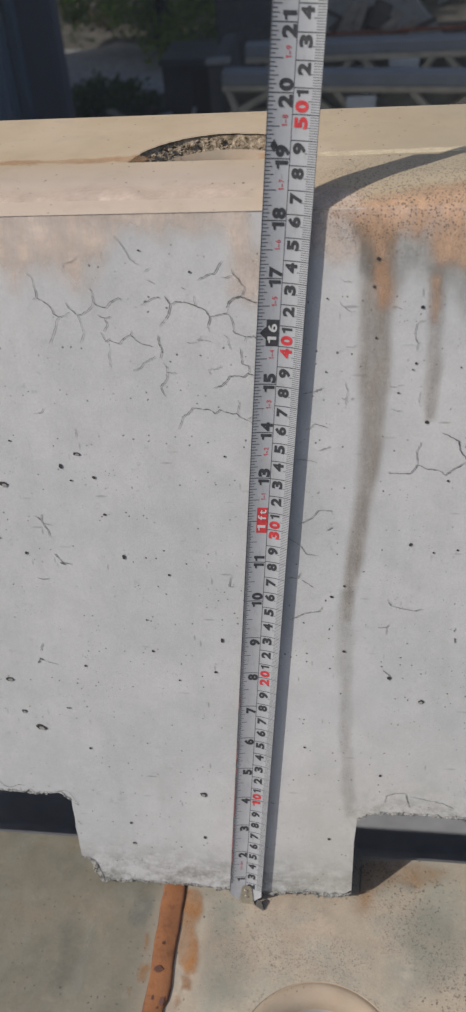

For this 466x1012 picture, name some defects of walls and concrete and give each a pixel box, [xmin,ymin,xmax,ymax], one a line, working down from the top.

spalling [128,132,266,163]
corrosion [313,184,466,264]
crack [25,239,257,426]
crack [398,433,466,475]